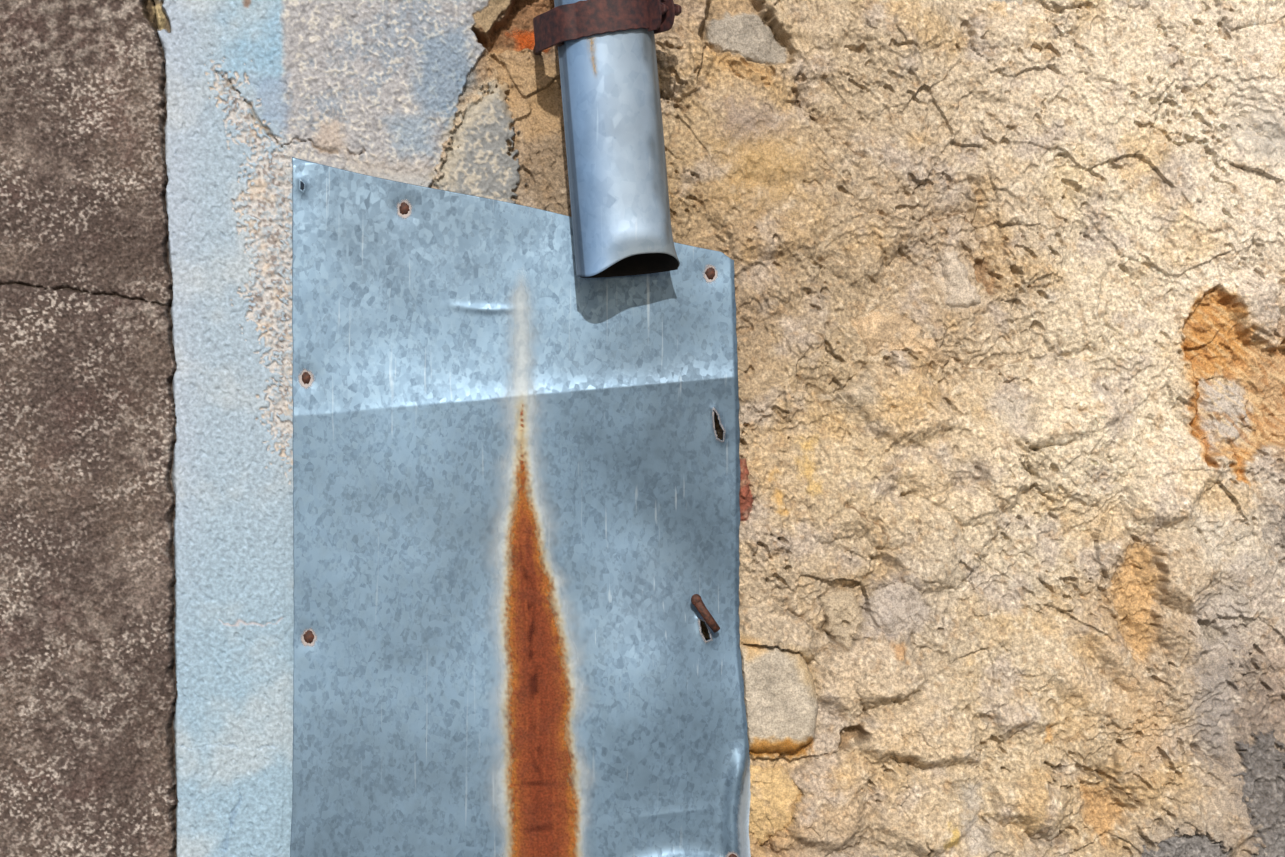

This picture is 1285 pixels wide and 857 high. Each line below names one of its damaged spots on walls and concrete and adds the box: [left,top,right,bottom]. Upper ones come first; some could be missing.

flaking render [701,7,796,66]
flaking render [942,251,981,310]
flaking render [852,309,950,368]
crack [0,0,284,857]
flaking render [1198,378,1251,448]
rust [497,288,586,857]
flaking render [820,583,933,649]
spalling [1101,539,1170,672]
flaking render [740,643,818,857]